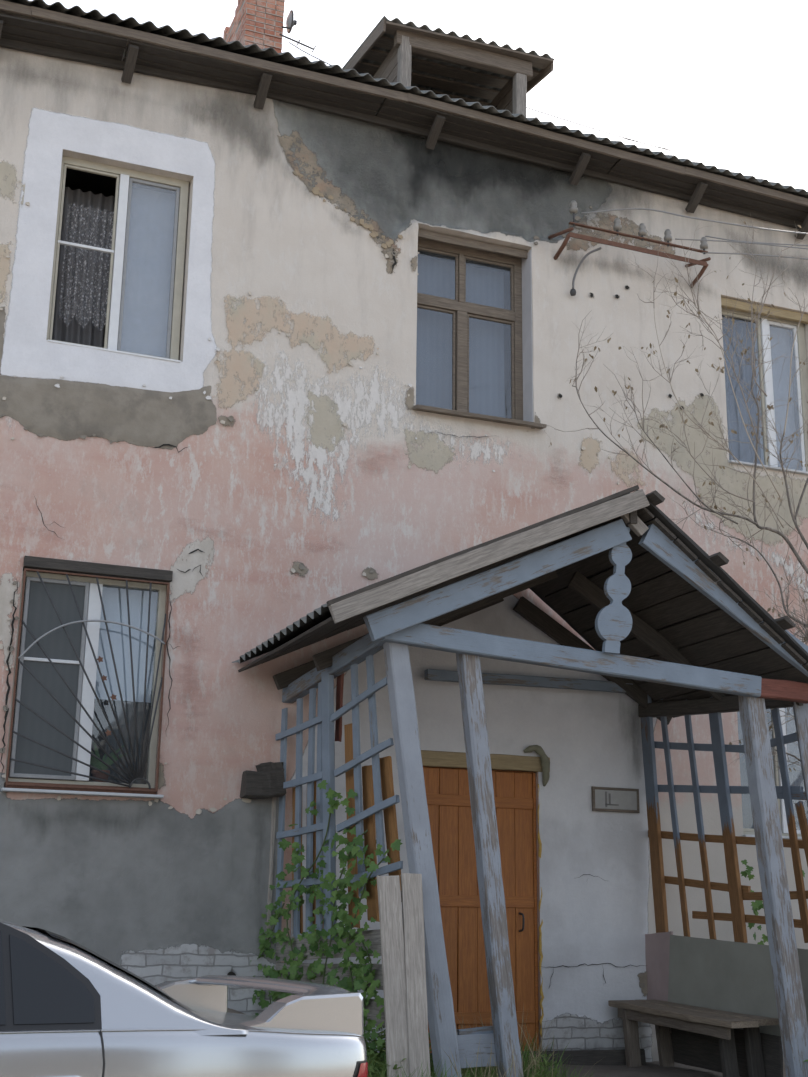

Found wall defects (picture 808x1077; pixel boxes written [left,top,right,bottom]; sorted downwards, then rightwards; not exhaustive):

peeling [0,161,30,206]
flaking render [273,99,675,275]
leakage [315,98,636,217]
peeling [0,242,11,310]
peeling [203,291,509,521]
peeling [638,393,808,599]
peeling [169,536,215,603]
peeling [0,572,20,671]
flaking render [121,943,276,1015]
crack [537,963,645,988]
flaking render [542,1013,625,1051]
flaking render [638,1022,653,1062]